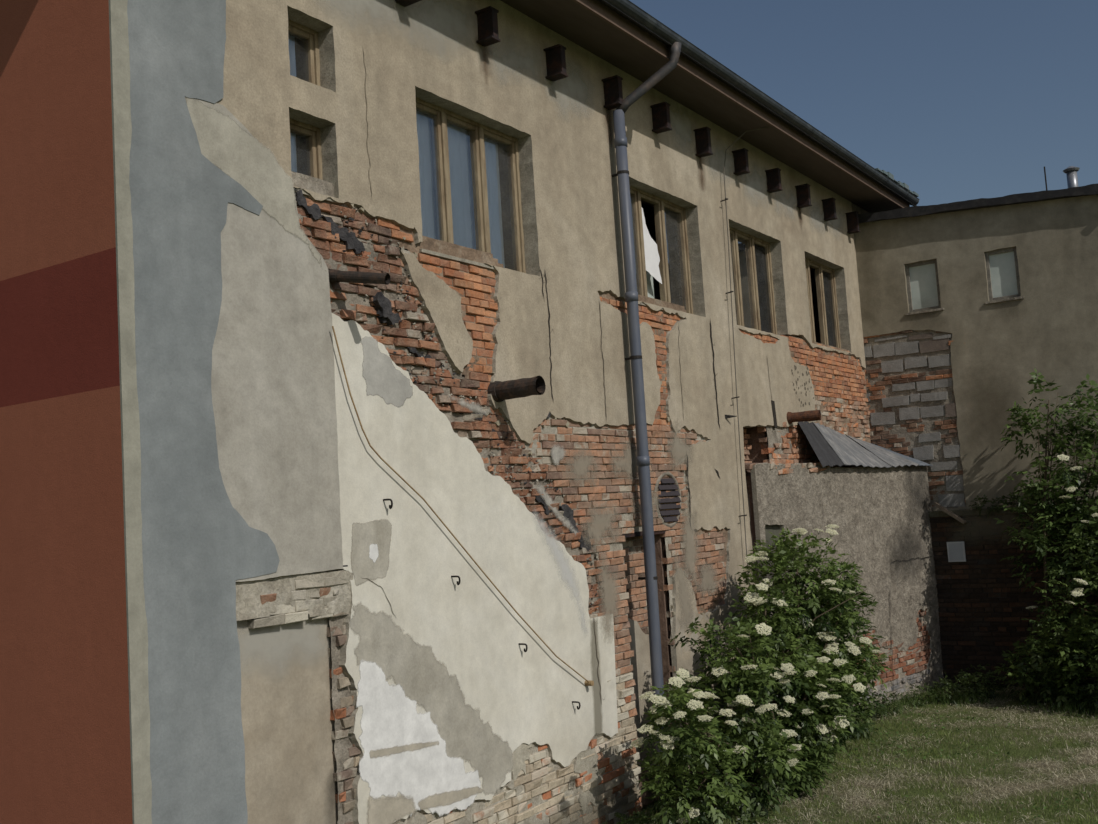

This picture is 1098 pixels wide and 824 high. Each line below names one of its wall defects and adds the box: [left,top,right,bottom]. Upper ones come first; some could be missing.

crack [363,50,372,192]
spalling [185,97,728,824]
spalling [740,330,967,509]
spalling [852,609,931,705]